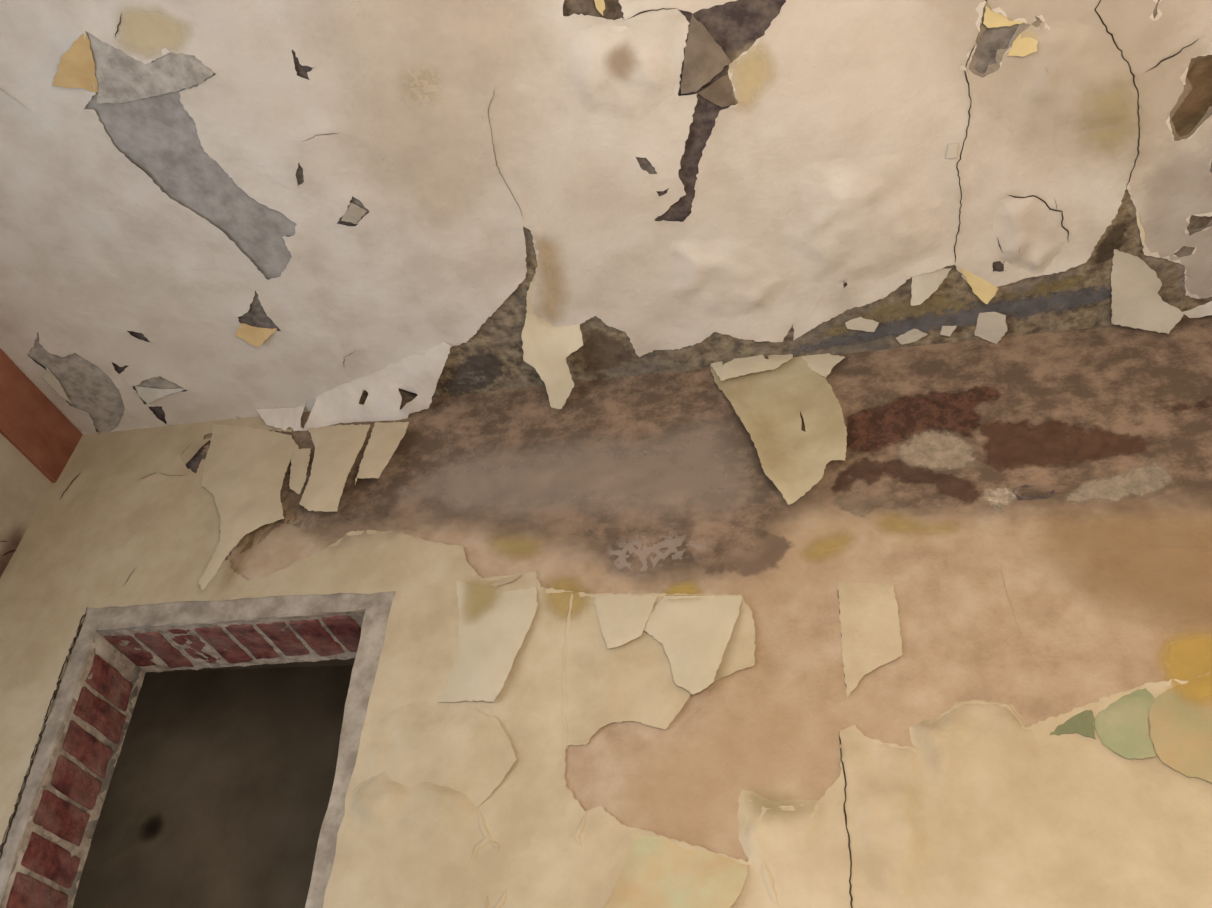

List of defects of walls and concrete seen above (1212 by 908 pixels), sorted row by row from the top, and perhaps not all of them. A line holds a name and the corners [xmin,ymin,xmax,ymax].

peeling [52,31,297,280]
peeling [563,0,624,20]
peeling [655,0,786,221]
crack [954,0,987,262]
crack [1009,195,1069,242]
crack [1094,0,1200,189]
peeling [1169,55,1212,141]
damp [550,583,583,612]
peeling [181,189,1212,908]
damp [287,315,1212,596]
damp [1166,638,1212,698]
crack [839,733,853,908]